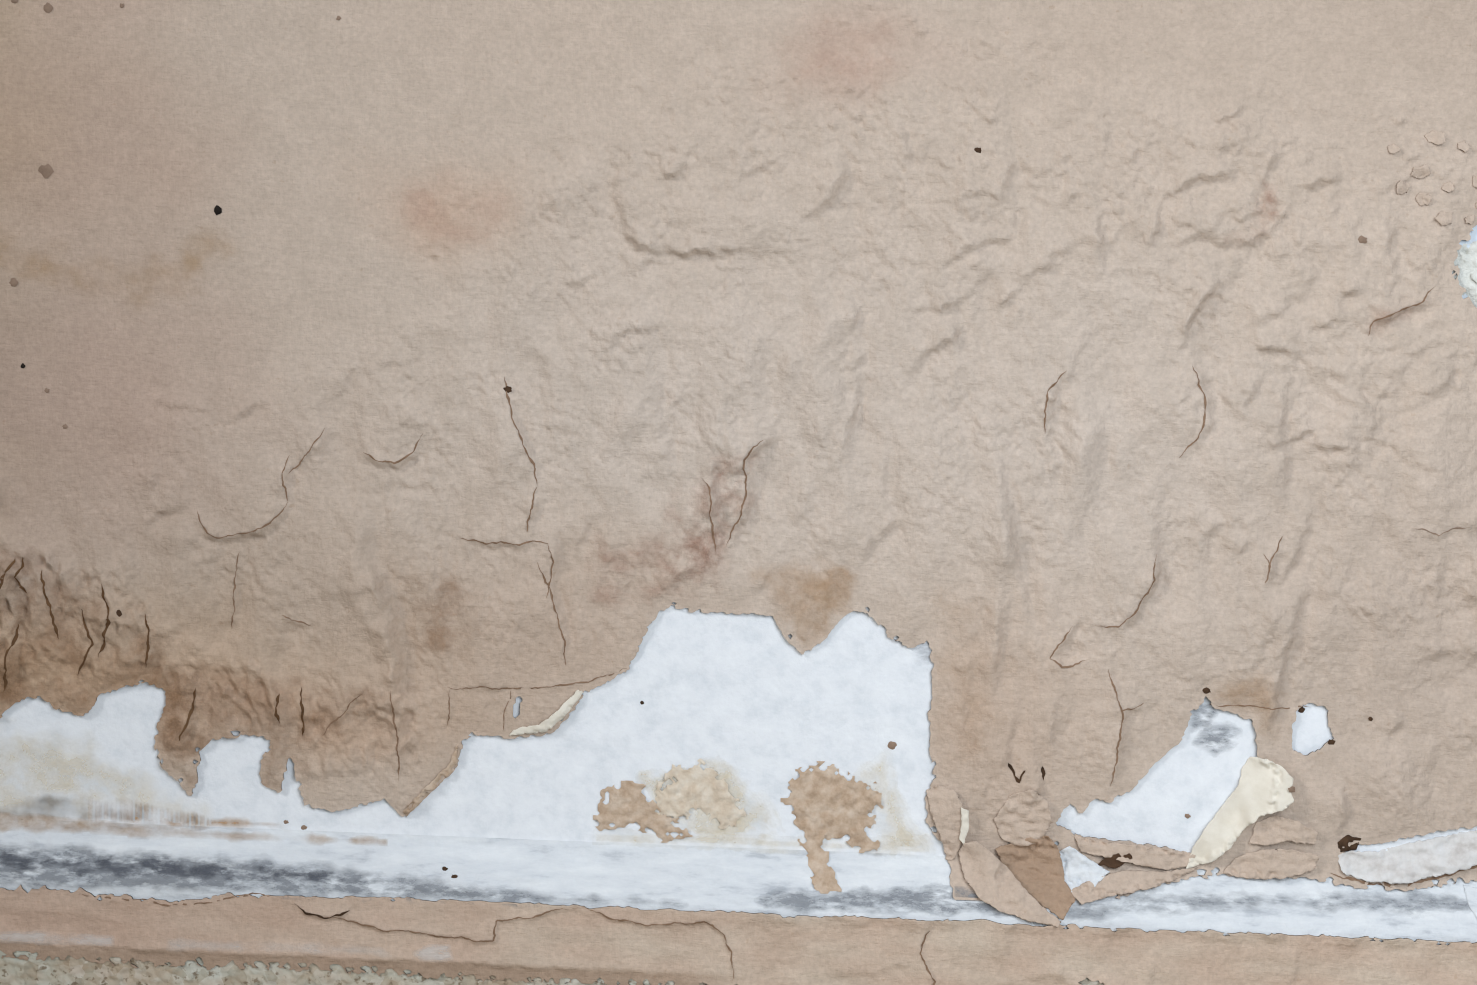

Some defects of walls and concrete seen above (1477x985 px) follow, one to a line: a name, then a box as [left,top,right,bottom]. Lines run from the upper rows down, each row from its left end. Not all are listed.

peeling [1396,164,1477,308]
peeling [0,602,1477,931]
damp [0,854,230,879]
damp [259,867,327,882]
crack [920,931,936,985]